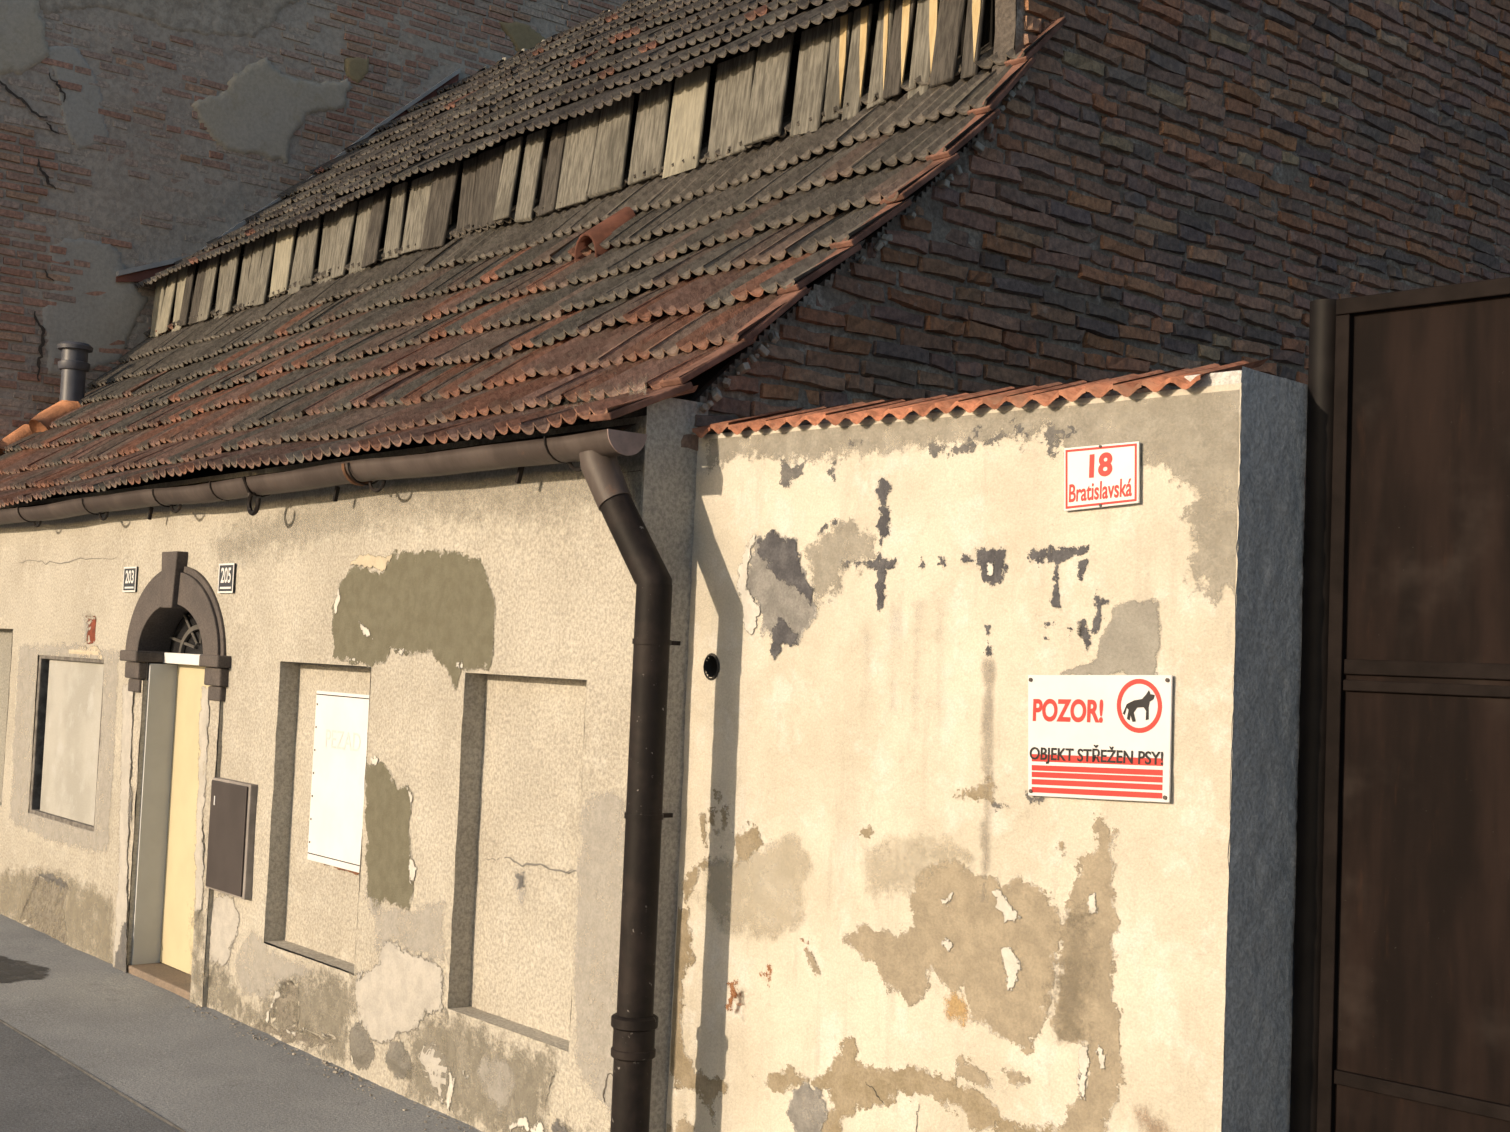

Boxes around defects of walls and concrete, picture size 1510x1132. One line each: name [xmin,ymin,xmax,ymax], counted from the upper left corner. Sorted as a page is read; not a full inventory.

peeling [0,0,109,150]
peeling [191,57,353,164]
peeling [42,238,148,376]
flaking render [331,548,496,691]
peeling [736,478,896,660]
flaking render [706,390,1240,606]
peeling [1027,544,1160,675]
flaking render [364,756,417,910]
crack [485,857,577,873]
peeling [670,789,764,1128]
peeling [752,813,1126,1132]
peeling [417,1041,453,1111]